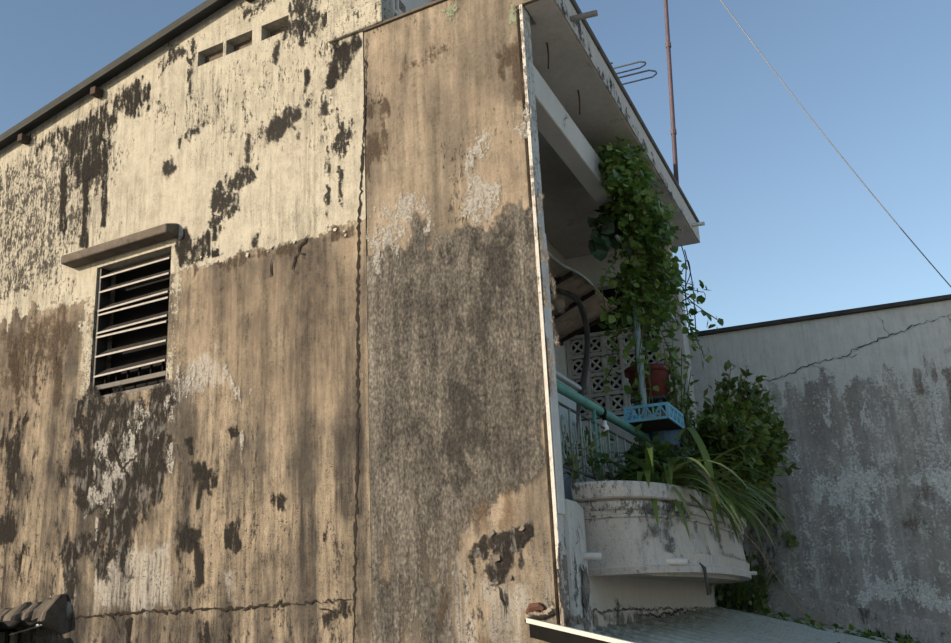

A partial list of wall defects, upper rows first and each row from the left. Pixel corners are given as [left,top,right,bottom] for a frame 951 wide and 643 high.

leakage [30,37,196,249]
leakage [162,116,213,177]
leakage [174,133,258,268]
leakage [272,0,327,65]
leakage [265,33,390,216]
peeling [553,0,656,166]
leakage [0,305,71,584]
leakage [47,358,219,603]
leakage [366,131,559,643]
peeling [812,459,887,524]
crack [751,315,951,385]
peeling [845,559,951,617]